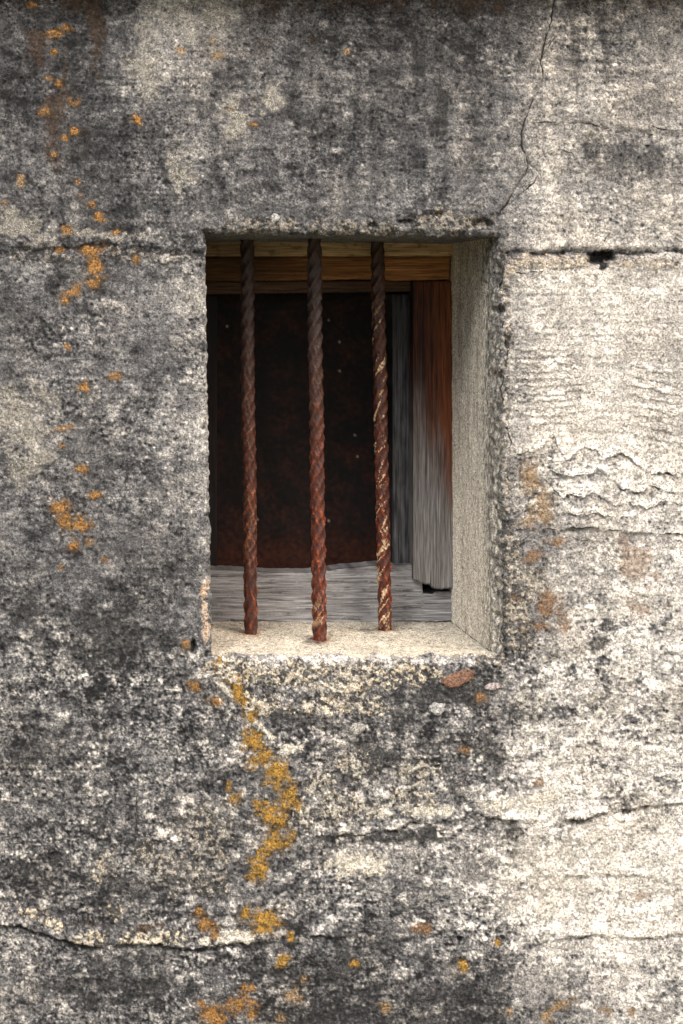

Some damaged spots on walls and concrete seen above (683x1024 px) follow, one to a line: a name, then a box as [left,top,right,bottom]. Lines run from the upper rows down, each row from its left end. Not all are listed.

crack [372,0,683,226]
spalling [199,250,683,831]
crack [4,927,311,952]